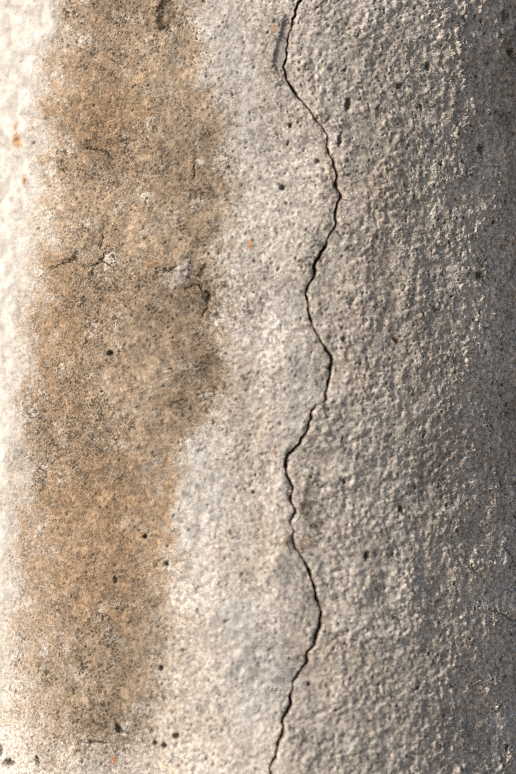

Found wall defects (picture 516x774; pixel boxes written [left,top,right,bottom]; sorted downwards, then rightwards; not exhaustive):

damp [0,0,246,761]
crack [268,0,347,774]